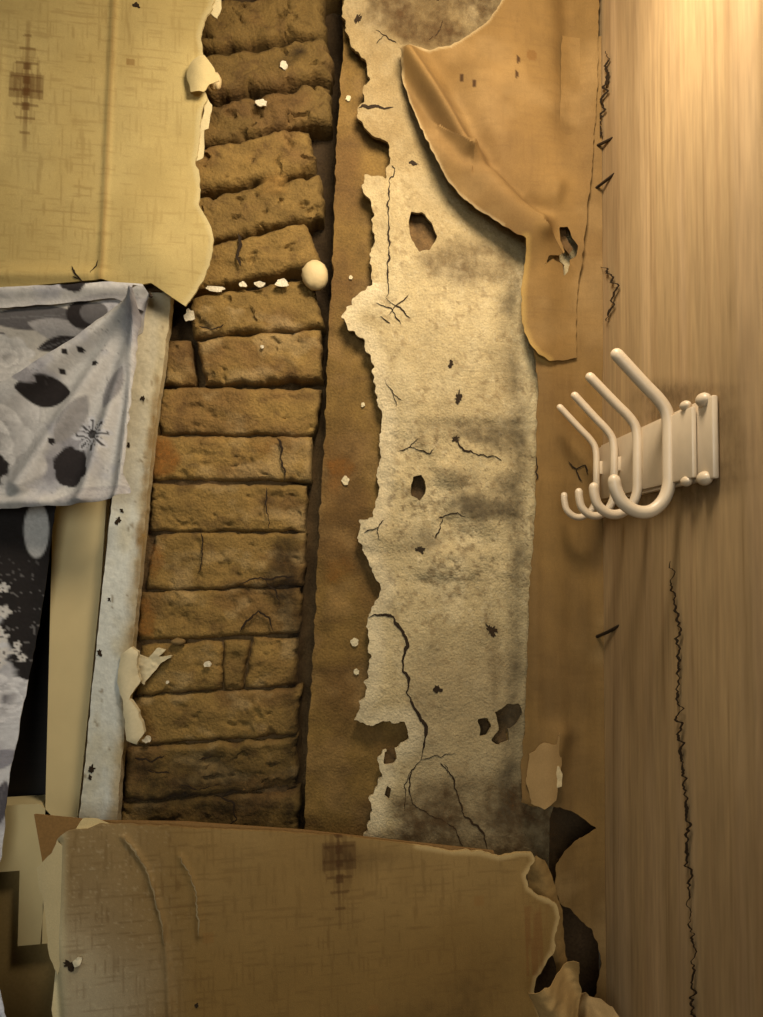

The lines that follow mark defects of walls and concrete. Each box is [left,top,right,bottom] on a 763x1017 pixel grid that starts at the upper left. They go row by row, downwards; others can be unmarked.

peeling [211,0,222,19]
water stain [381,0,464,45]
water stain [457,0,495,21]
peeling [197,100,212,161]
flaking render [409,213,436,252]
flaking render [304,14,409,836]
flaking render [411,475,426,500]
crack [370,613,487,848]
flaking render [478,703,521,744]